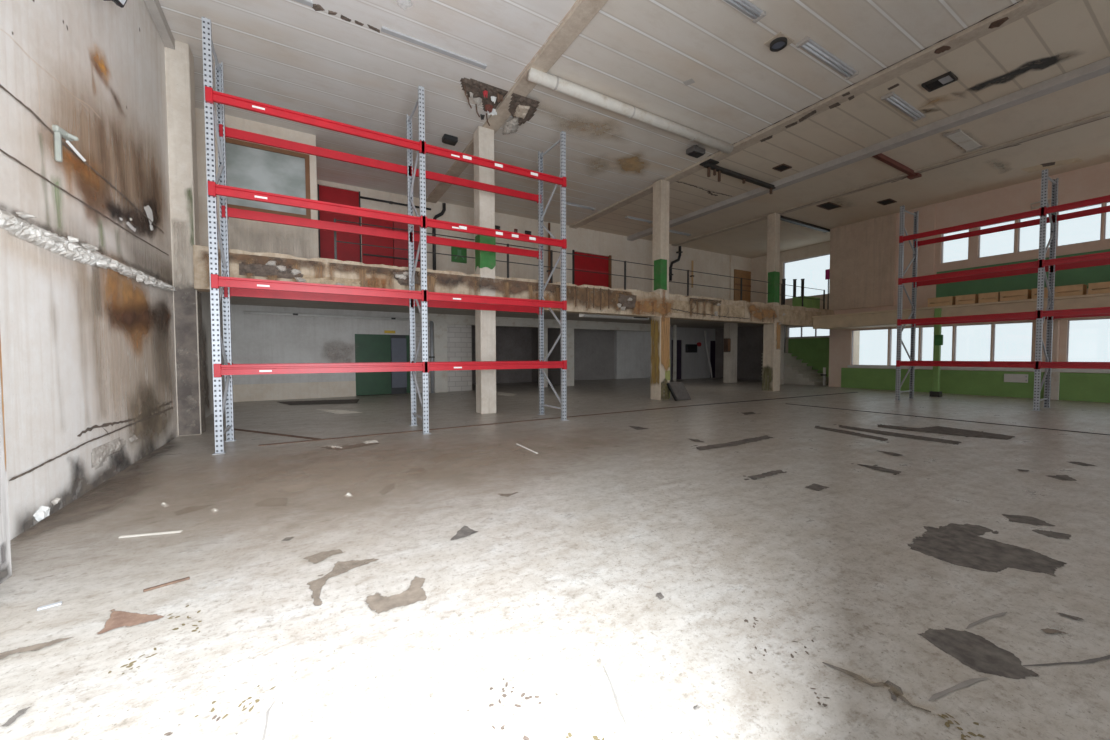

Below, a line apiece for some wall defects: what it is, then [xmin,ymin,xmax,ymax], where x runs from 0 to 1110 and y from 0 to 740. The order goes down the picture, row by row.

rust [93,54,108,74]
leakage [65,109,162,220]
spalling [0,205,176,293]
spalling [239,261,360,287]
spalling [393,272,420,286]
rust [94,268,170,379]
spalling [779,308,822,326]
leakage [0,189,210,584]
crack [822,662,931,712]